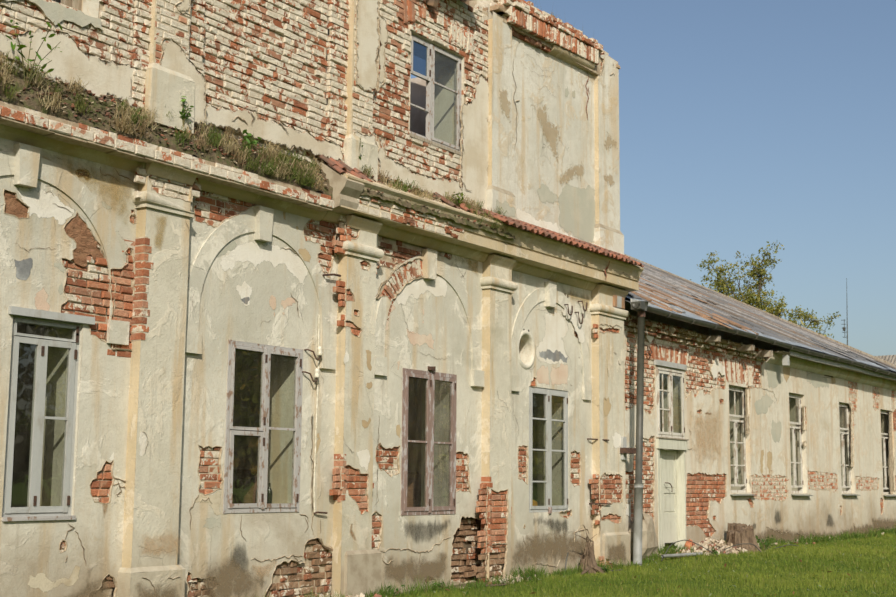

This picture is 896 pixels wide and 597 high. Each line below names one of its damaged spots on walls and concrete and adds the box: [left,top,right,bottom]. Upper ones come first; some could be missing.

flaking render [0,0,152,109]
flaking render [189,0,350,166]
flaking render [372,0,489,190]
crack [512,54,561,146]
flaking render [134,163,257,228]
flaking render [3,187,154,358]
flaking render [536,294,790,508]
flaking render [265,538,332,597]
flaking render [329,425,401,550]
flaking render [450,451,512,583]
flaking render [570,435,655,525]
flaking render [686,472,727,538]